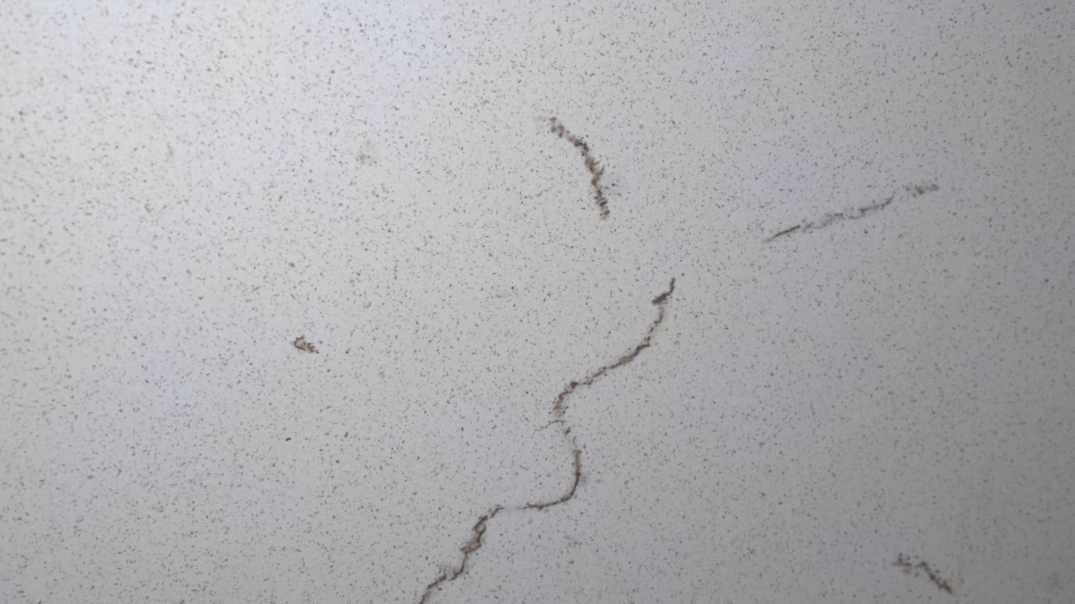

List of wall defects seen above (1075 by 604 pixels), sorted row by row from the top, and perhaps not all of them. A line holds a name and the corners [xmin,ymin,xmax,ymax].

crack [560,128,614,215]
crack [420,279,674,604]